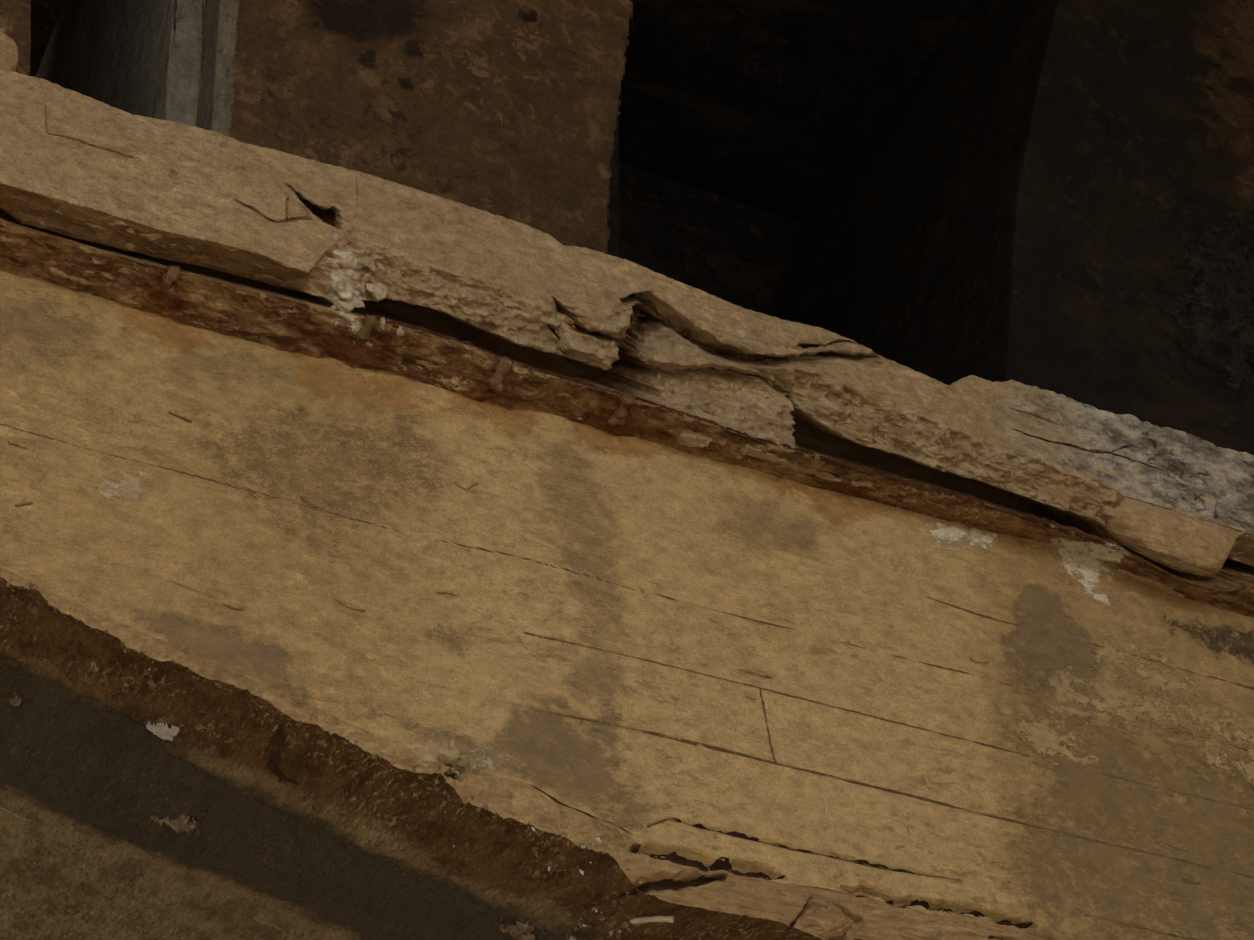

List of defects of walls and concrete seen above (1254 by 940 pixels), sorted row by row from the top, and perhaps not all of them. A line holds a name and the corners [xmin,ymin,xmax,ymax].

crack [173,0,204,76]
crack [236,175,358,227]
corrosion [135,281,188,318]
corrosion [320,328,387,370]
crack [548,293,859,378]
peeling [555,304,873,375]
corrosion [580,396,638,437]
spalling [364,316,1122,550]
corrosion [811,474,870,499]
peeling [995,636,1254,788]
leakage [1002,584,1254,940]
spalling [150,815,201,838]